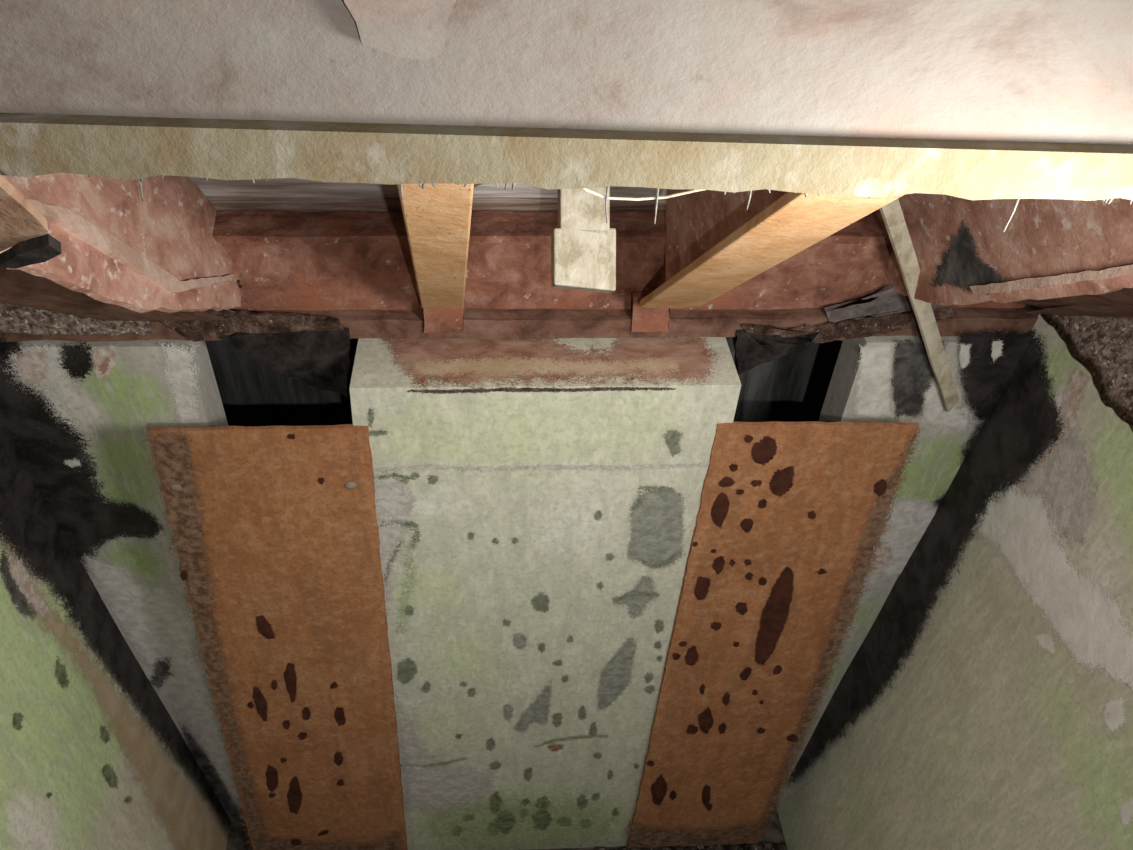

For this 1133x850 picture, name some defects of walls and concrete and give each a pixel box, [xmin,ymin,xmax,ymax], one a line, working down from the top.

corrosion [381,337,722,393]
damp [711,435,795,533]
damp [787,325,1076,787]
damp [0,427,231,835]
damp [256,615,276,639]
damp [672,641,699,666]
damp [694,549,795,705]
damp [247,663,311,741]
damp [334,707,346,726]
damp [686,684,727,735]
damp [265,758,302,814]
damp [647,760,677,806]